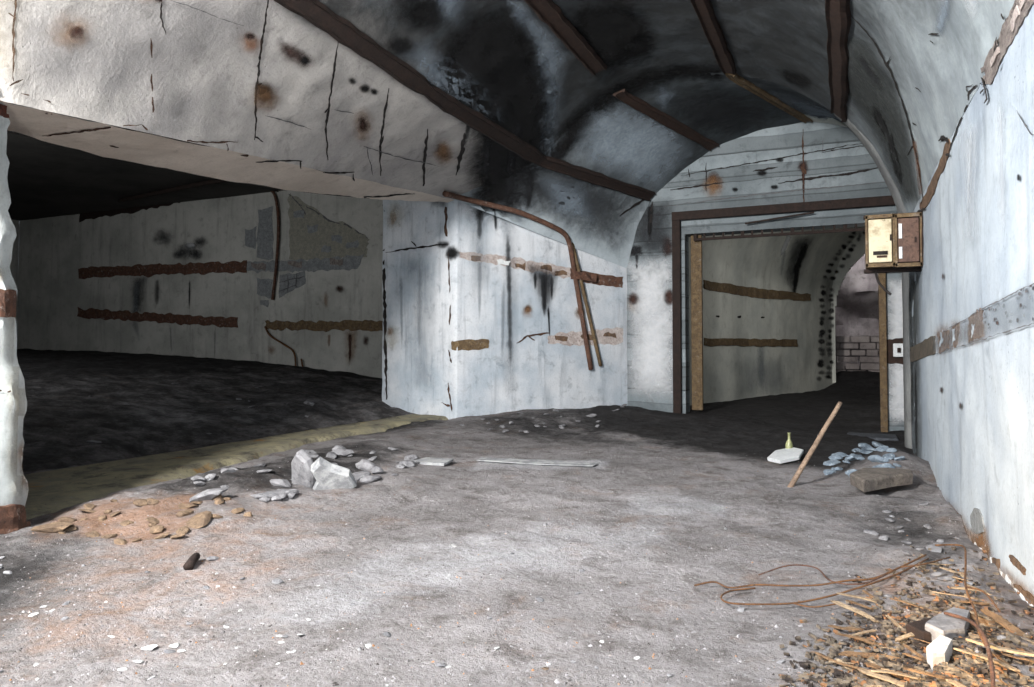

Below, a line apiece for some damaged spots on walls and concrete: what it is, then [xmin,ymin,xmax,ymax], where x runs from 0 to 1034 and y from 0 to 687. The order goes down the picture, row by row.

crack [9,0,23,86]
rust [66,26,82,38]
crack [150,0,354,159]
leakage [414,49,499,122]
leakage [511,2,562,153]
spalling [980,0,1034,103]
spalling [245,193,369,307]
leakage [477,209,497,237]
rust [0,289,17,318]
rust [77,307,238,328]
leakage [534,274,553,335]
spalling [937,283,1034,354]